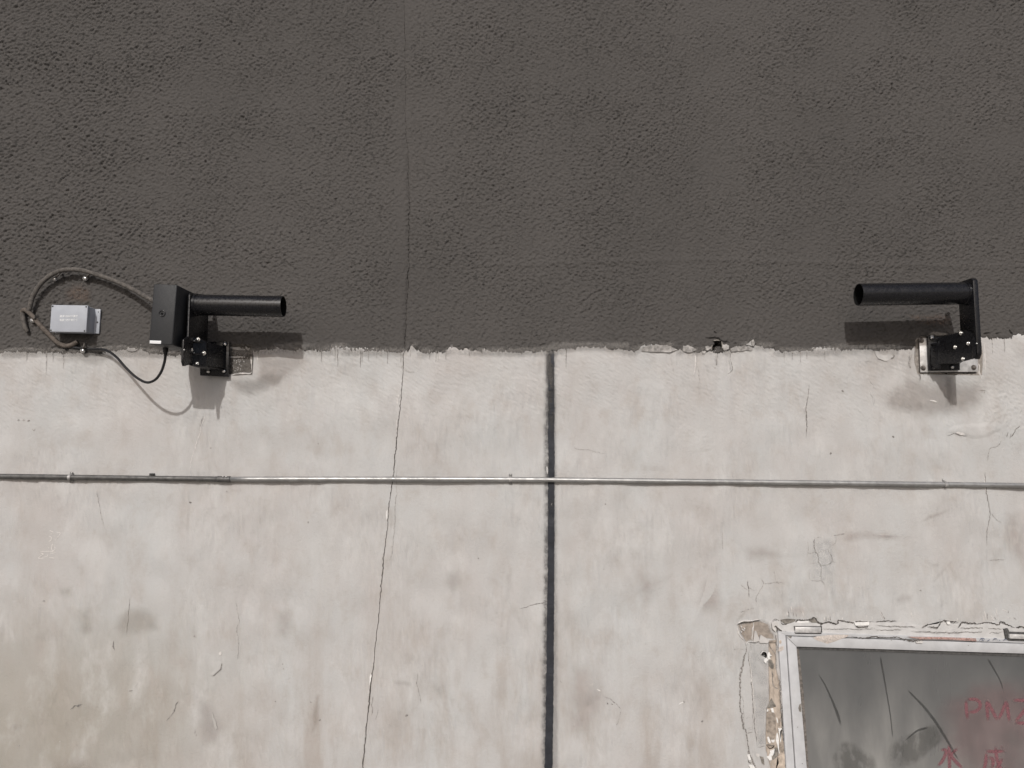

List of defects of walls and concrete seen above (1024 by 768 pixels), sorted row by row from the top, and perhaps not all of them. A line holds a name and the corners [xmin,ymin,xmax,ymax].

crack [362,5,411,768]
crack [984,427,1019,530]
spalling [737,619,785,768]